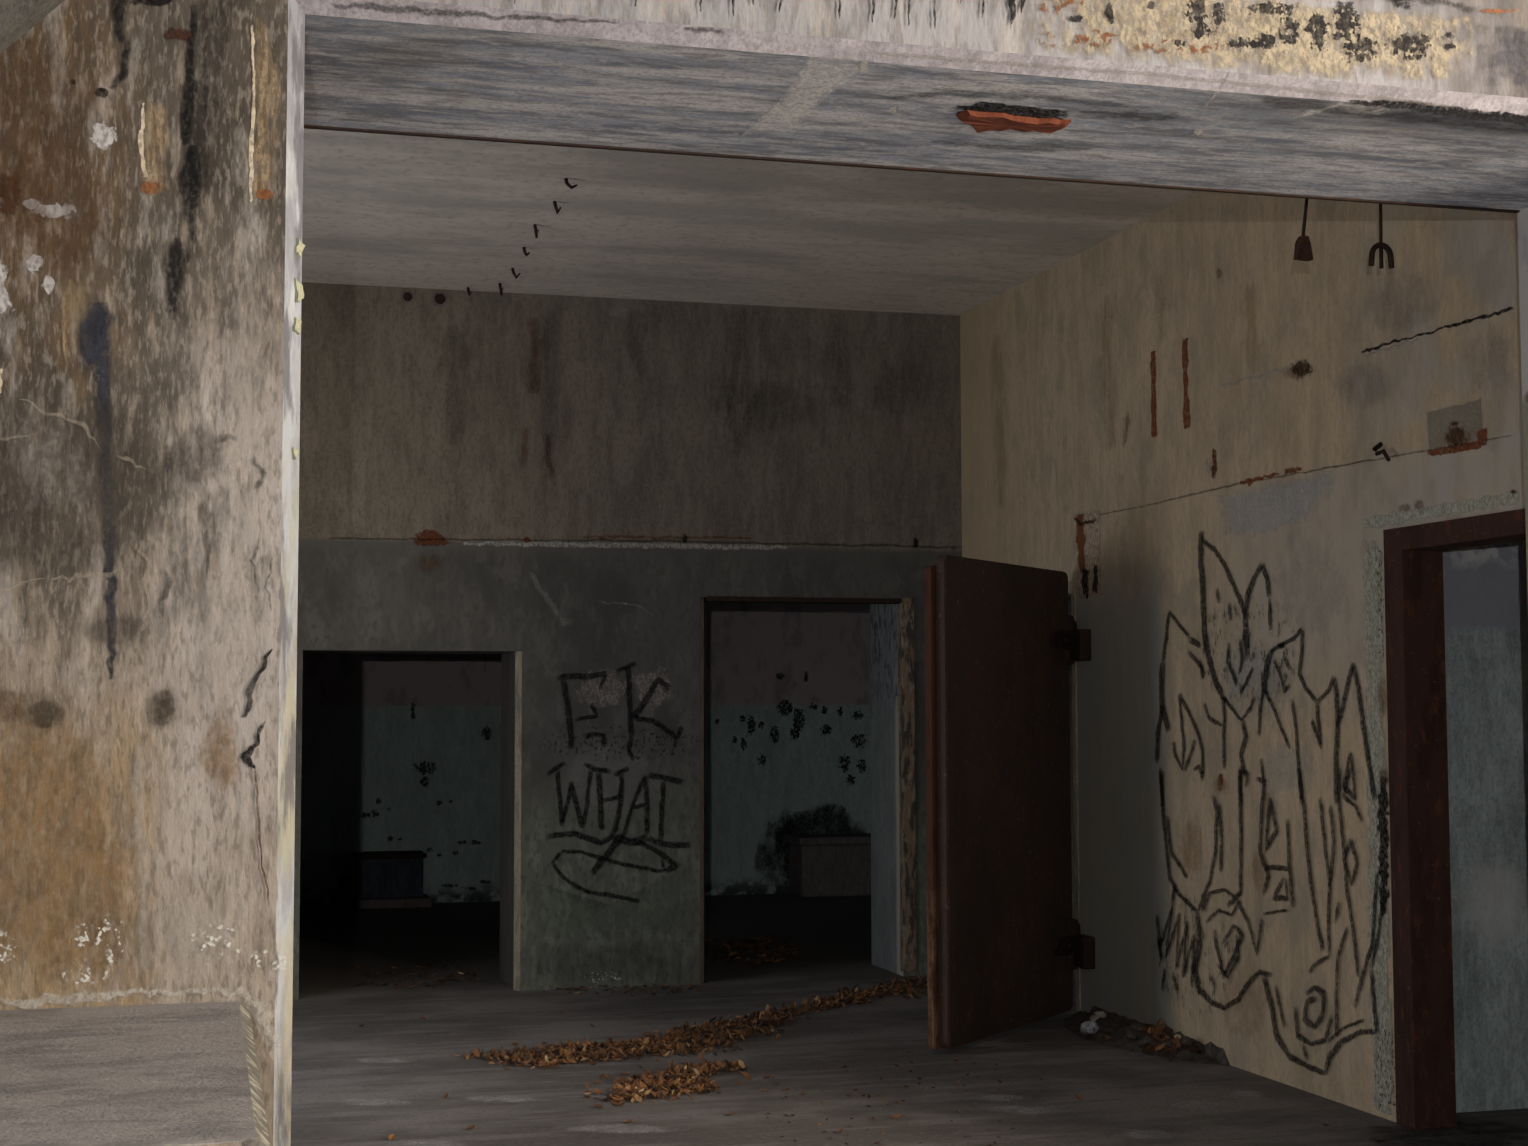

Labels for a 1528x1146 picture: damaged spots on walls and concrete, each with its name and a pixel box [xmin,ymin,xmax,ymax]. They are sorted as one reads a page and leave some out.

water stain [166,12,201,313]
crack [1362,307,1513,356]
rust [1182,338,1191,429]
water stain [80,302,117,679]
rust [414,529,448,546]
crack [240,649,273,900]
water stain [62,919,123,984]
water stain [191,924,288,978]